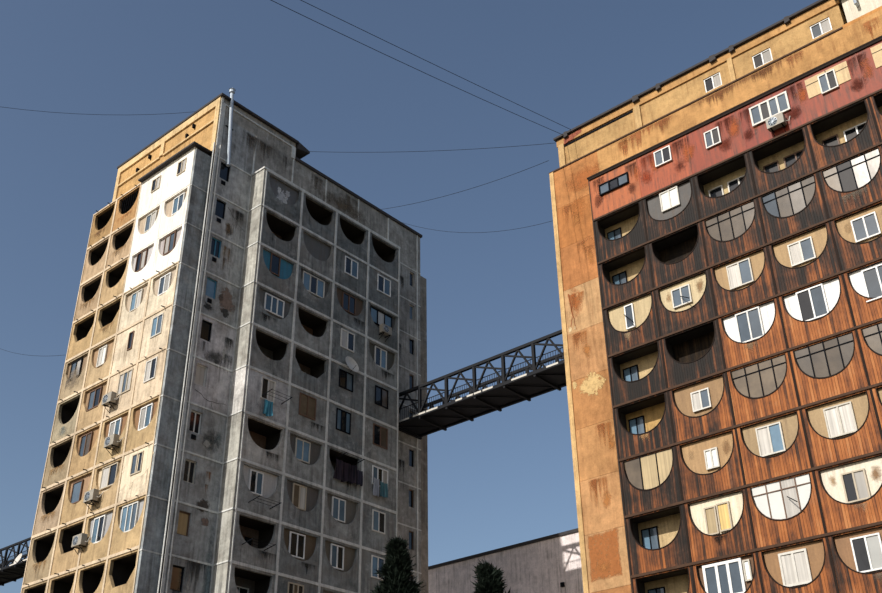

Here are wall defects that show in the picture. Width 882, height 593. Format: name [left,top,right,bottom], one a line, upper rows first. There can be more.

rust [569,291,583,310]